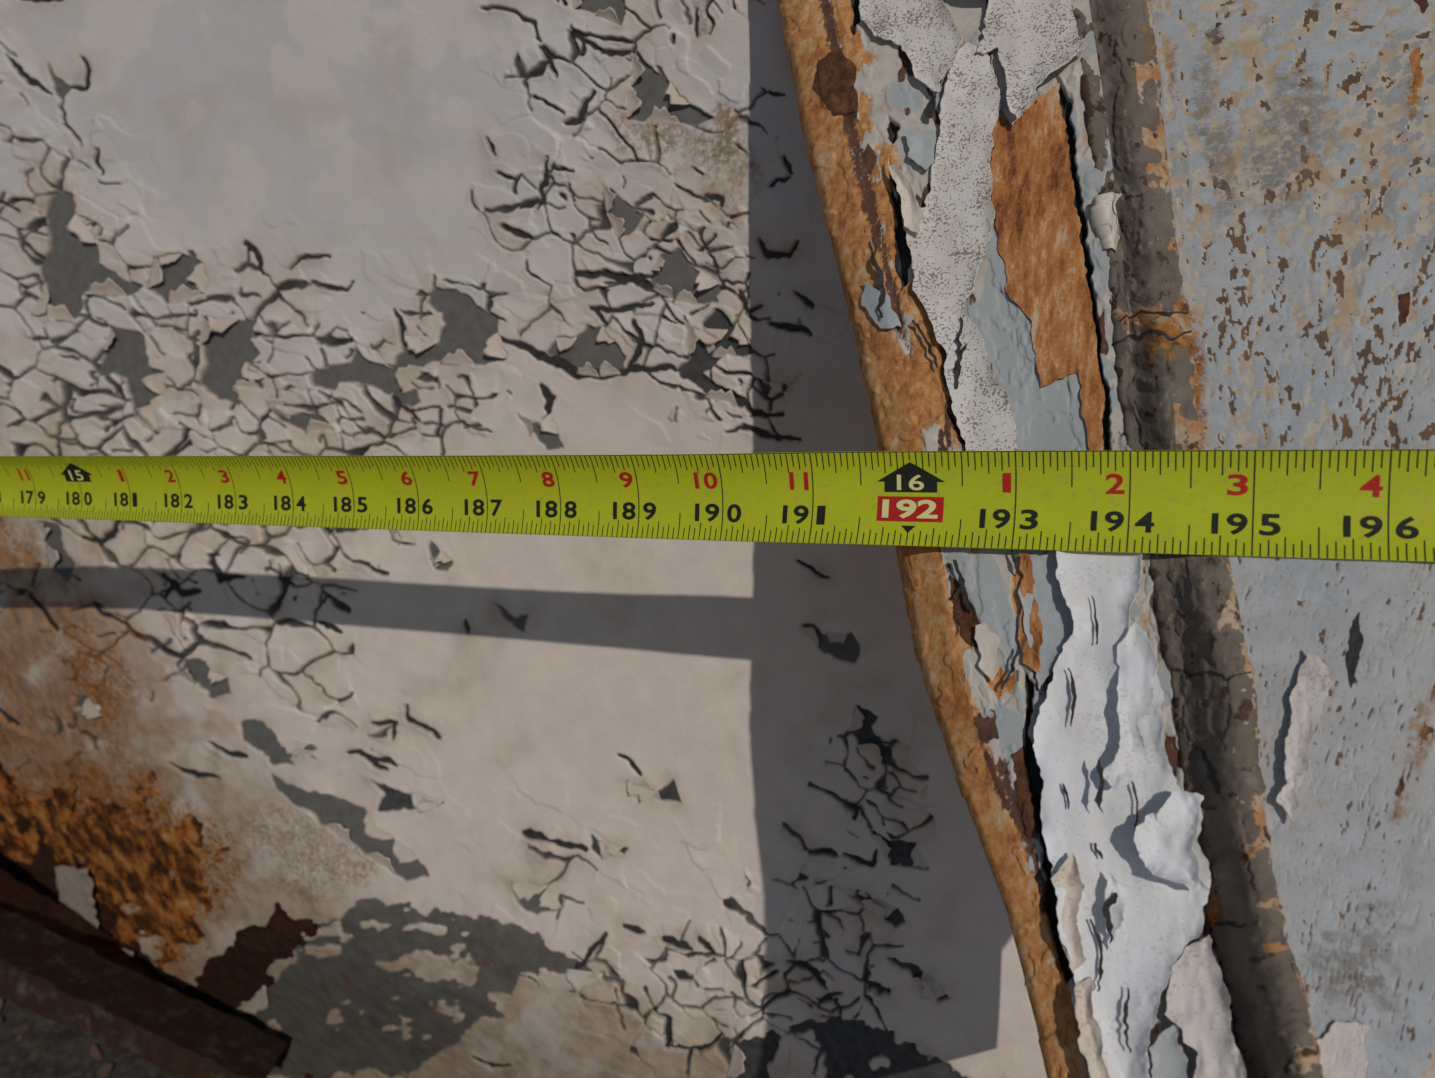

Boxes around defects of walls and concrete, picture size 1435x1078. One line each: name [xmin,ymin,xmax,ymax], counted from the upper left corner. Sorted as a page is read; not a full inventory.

crack [9,57,105,175]
crack [481,0,635,125]
crack [488,139,575,241]
peeling [859,0,1122,451]
crack [501,269,679,415]
rust [1139,304,1206,422]
rust [0,742,248,986]
peeling [1011,551,1247,1078]
peeling [183,898,625,1078]
crack [574,924,717,979]
peeling [726,1015,967,1078]
peeling [1316,1020,1369,1078]